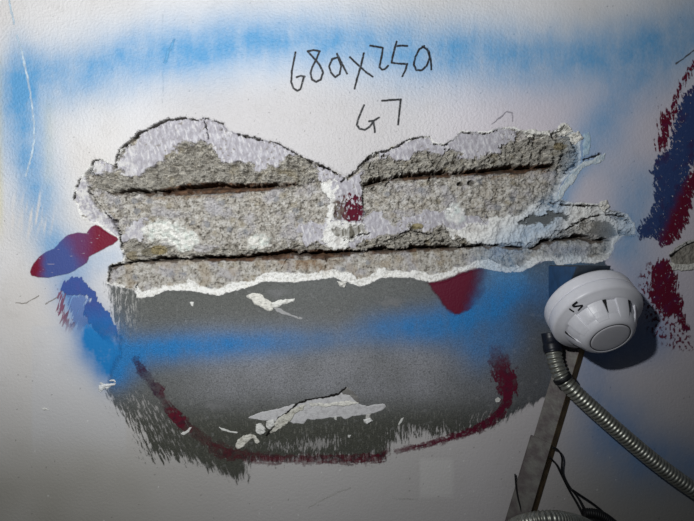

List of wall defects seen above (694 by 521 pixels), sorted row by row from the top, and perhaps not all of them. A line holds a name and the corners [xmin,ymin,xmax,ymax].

spalling [71,115,637,319]
peeling [669,239,694,271]
peeling [219,387,386,449]